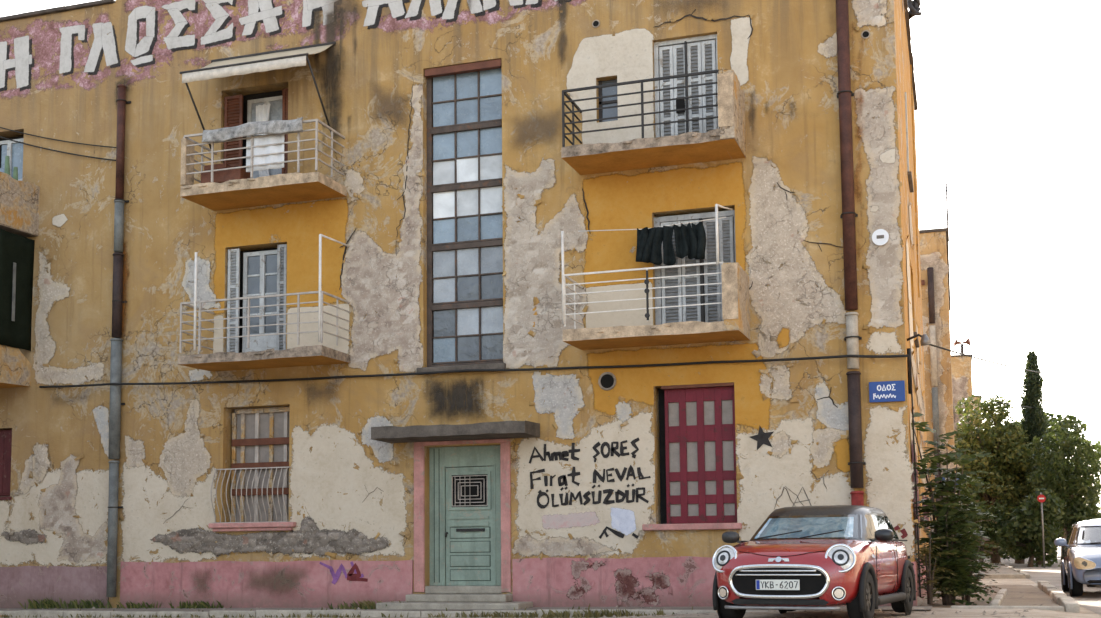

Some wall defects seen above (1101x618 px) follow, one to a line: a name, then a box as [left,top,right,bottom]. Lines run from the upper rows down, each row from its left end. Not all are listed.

flaking render [851,0,889,39]
flaking render [341,84,425,373]
flaking render [33,251,106,386]
flaking render [188,368,212,382]
peeling [0,397,411,568]
leakage [429,380,481,417]
flaking render [502,157,672,607]
flaking render [735,85,970,556]